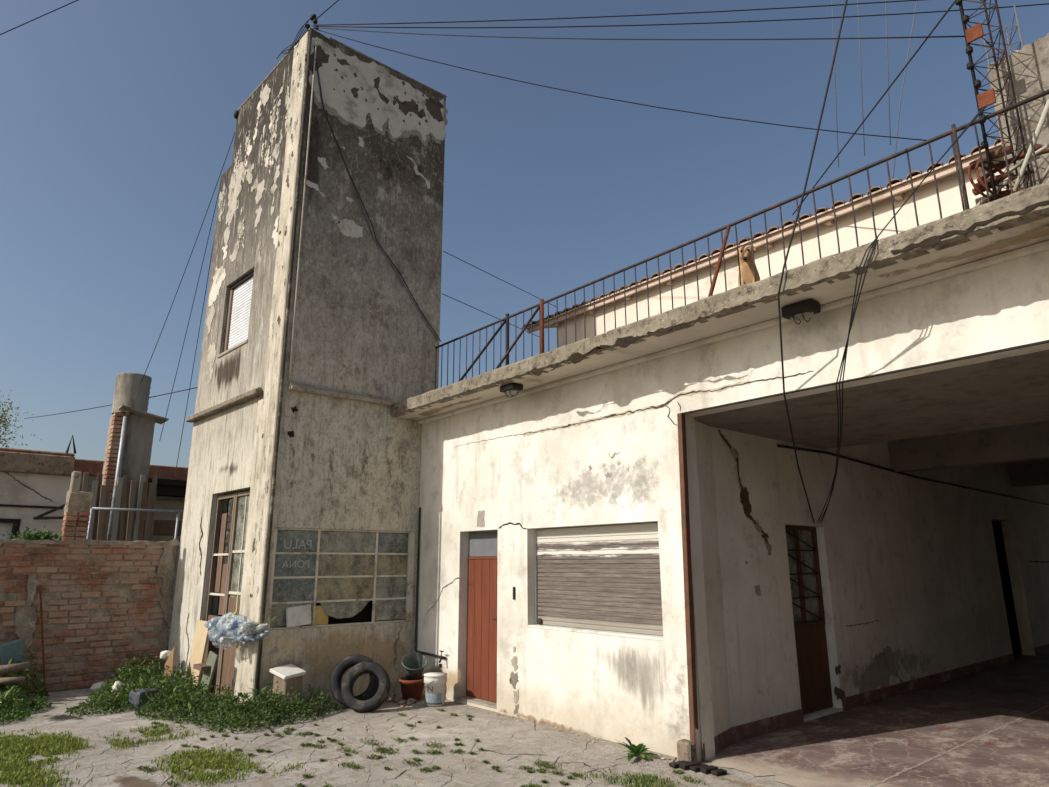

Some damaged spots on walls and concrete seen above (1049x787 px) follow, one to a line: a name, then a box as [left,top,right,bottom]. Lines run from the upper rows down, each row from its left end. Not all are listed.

peeling [206,37,448,384]
spalling [891,236,941,254]
spalling [532,318,701,376]
crack [456,371,812,447]
crack [5,472,53,502]
crack [718,429,772,555]
peeling [15,574,39,648]
peeling [509,646,519,714]
crack [870,705,1049,787]